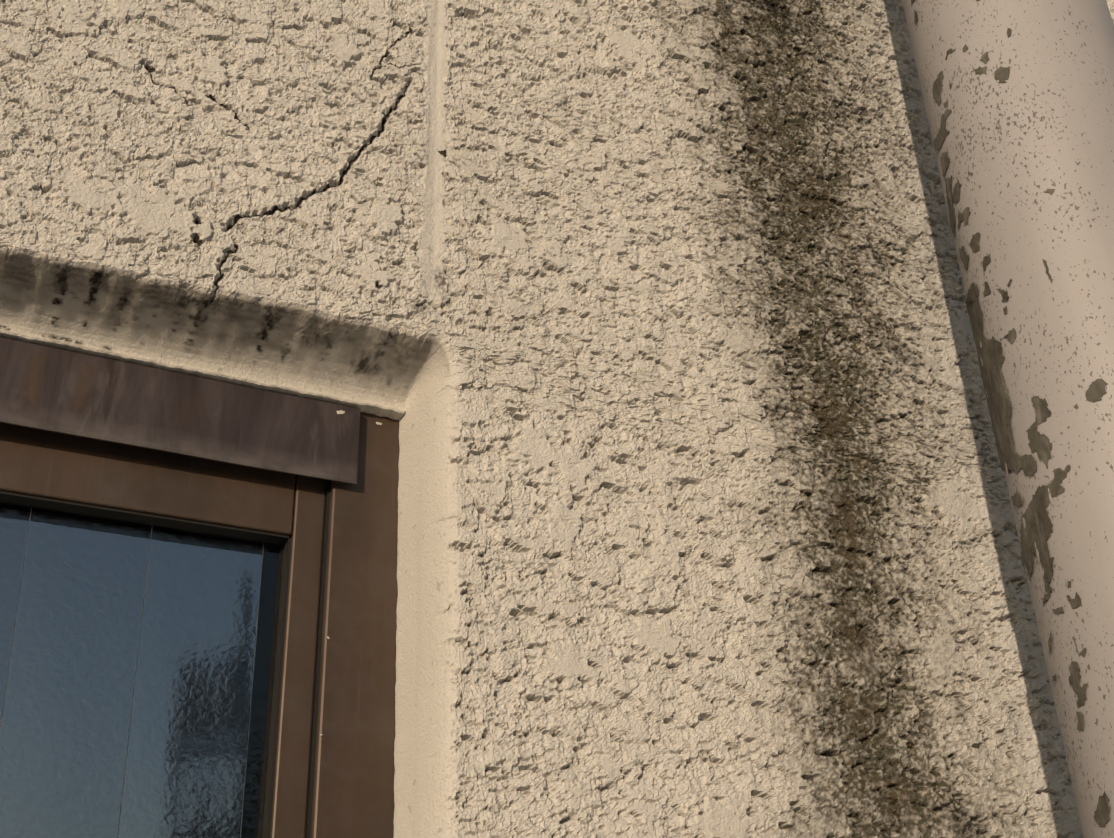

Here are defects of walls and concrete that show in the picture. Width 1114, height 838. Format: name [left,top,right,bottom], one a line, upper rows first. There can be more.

crack [150,73,249,129]
crack [210,26,420,303]
water stain [51,268,238,343]
water stain [257,307,287,352]
water stain [694,0,1016,838]